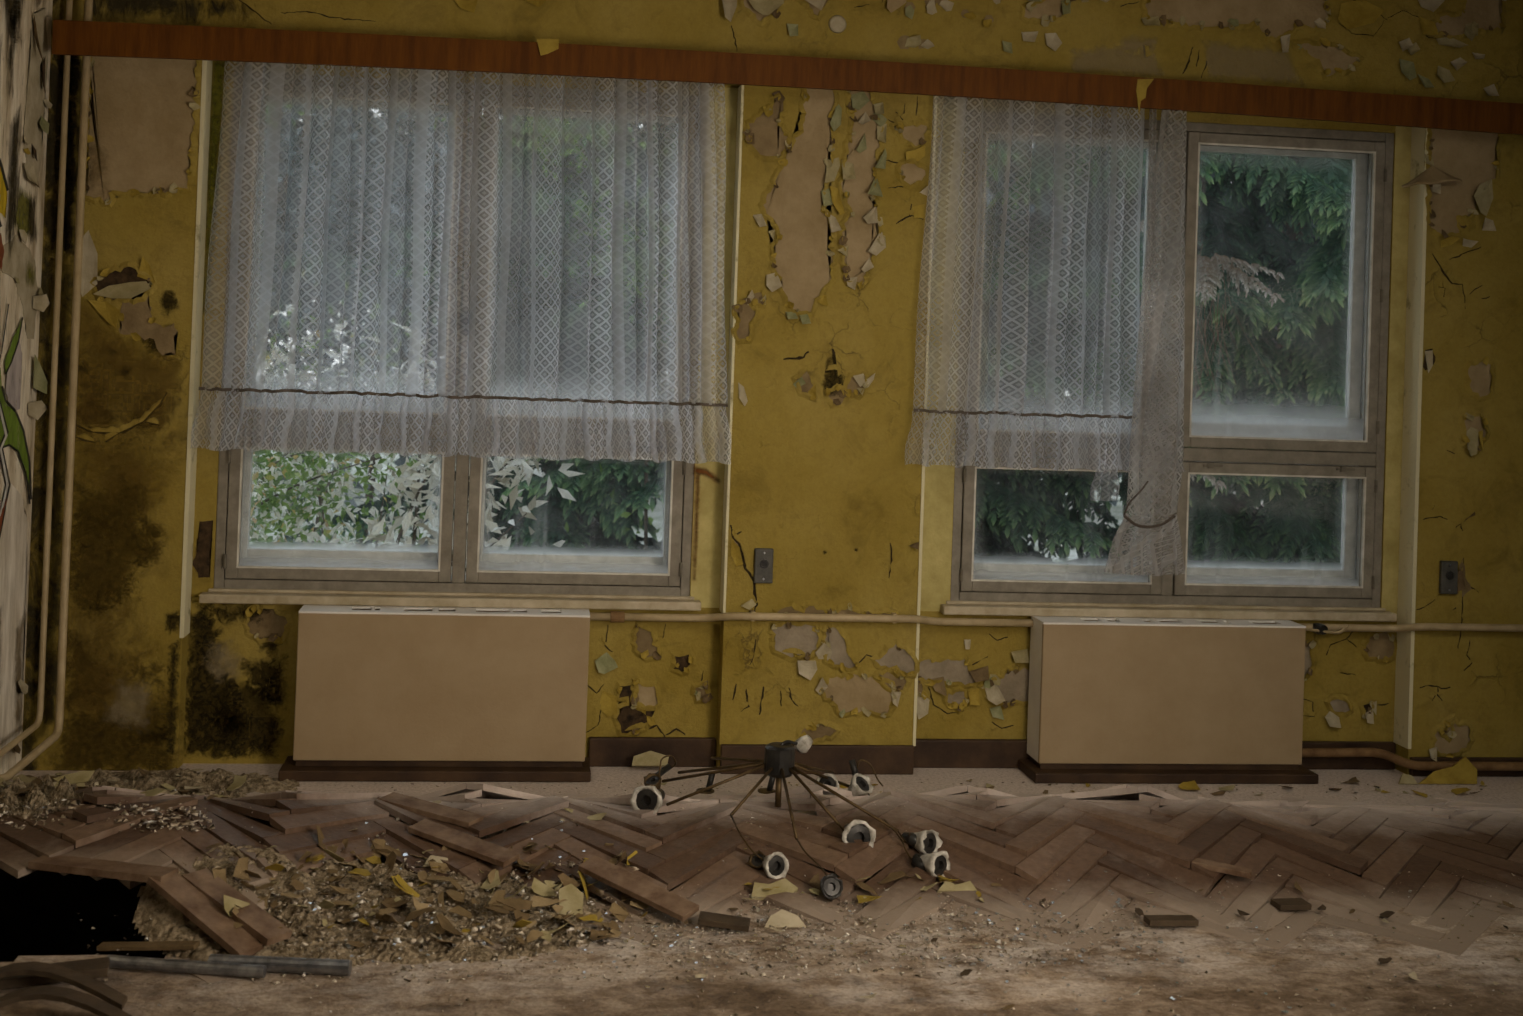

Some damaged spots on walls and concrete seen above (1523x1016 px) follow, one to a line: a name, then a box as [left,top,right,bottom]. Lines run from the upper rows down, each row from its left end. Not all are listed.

mould [92,0,245,25]
peeling [1139,0,1333,52]
peeling [85,56,202,208]
peeling [731,88,932,344]
peeling [1402,128,1503,248]
peeling [81,230,178,355]
water stain [28,55,288,771]
water stain [15,623,23,721]
crack [586,625,690,737]
peeling [595,621,713,737]
crack [693,524,805,715]
peeling [742,599,1029,745]